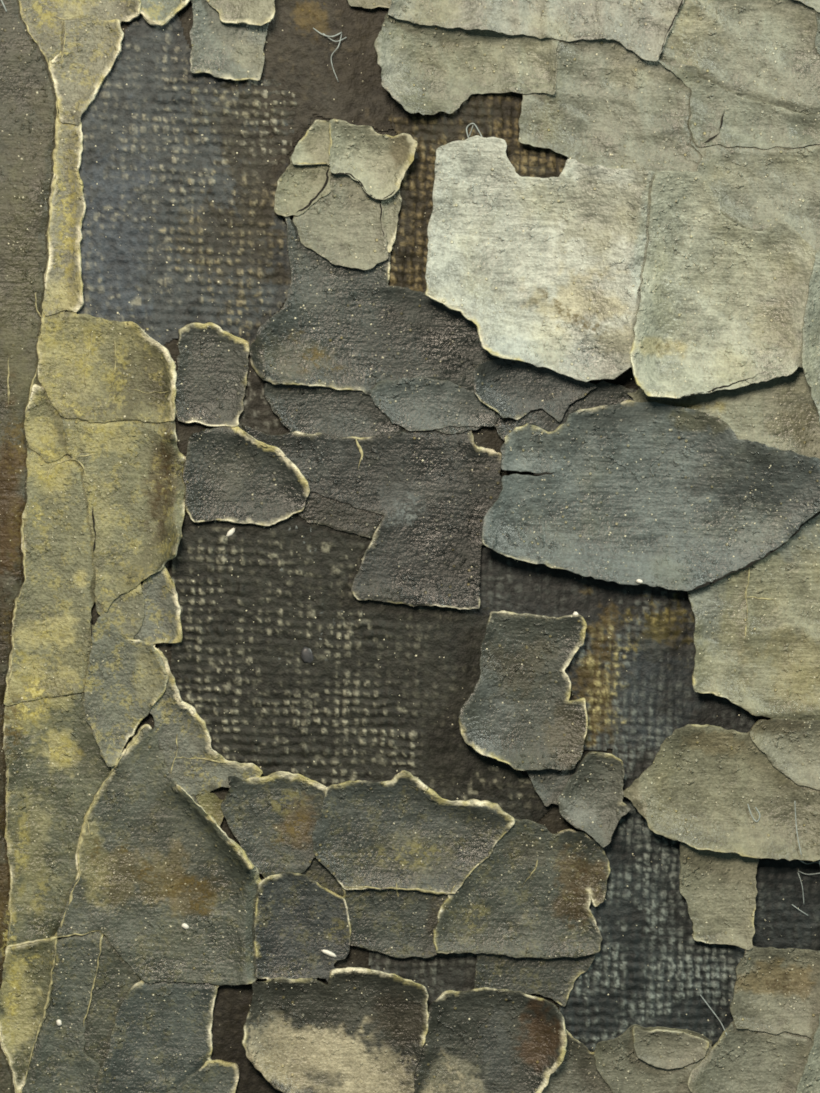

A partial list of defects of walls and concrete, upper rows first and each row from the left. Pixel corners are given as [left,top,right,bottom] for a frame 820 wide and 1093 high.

crack [659,0,683,55]
crack [704,113,724,143]
peeling [175,0,820,612]
crack [8,521,26,691]
crack [90,510,98,552]
peeling [0,0,297,988]
damp [6,652,49,736]
peeling [0,400,820,1093]
damp [0,913,38,1027]
crack [0,727,144,1093]